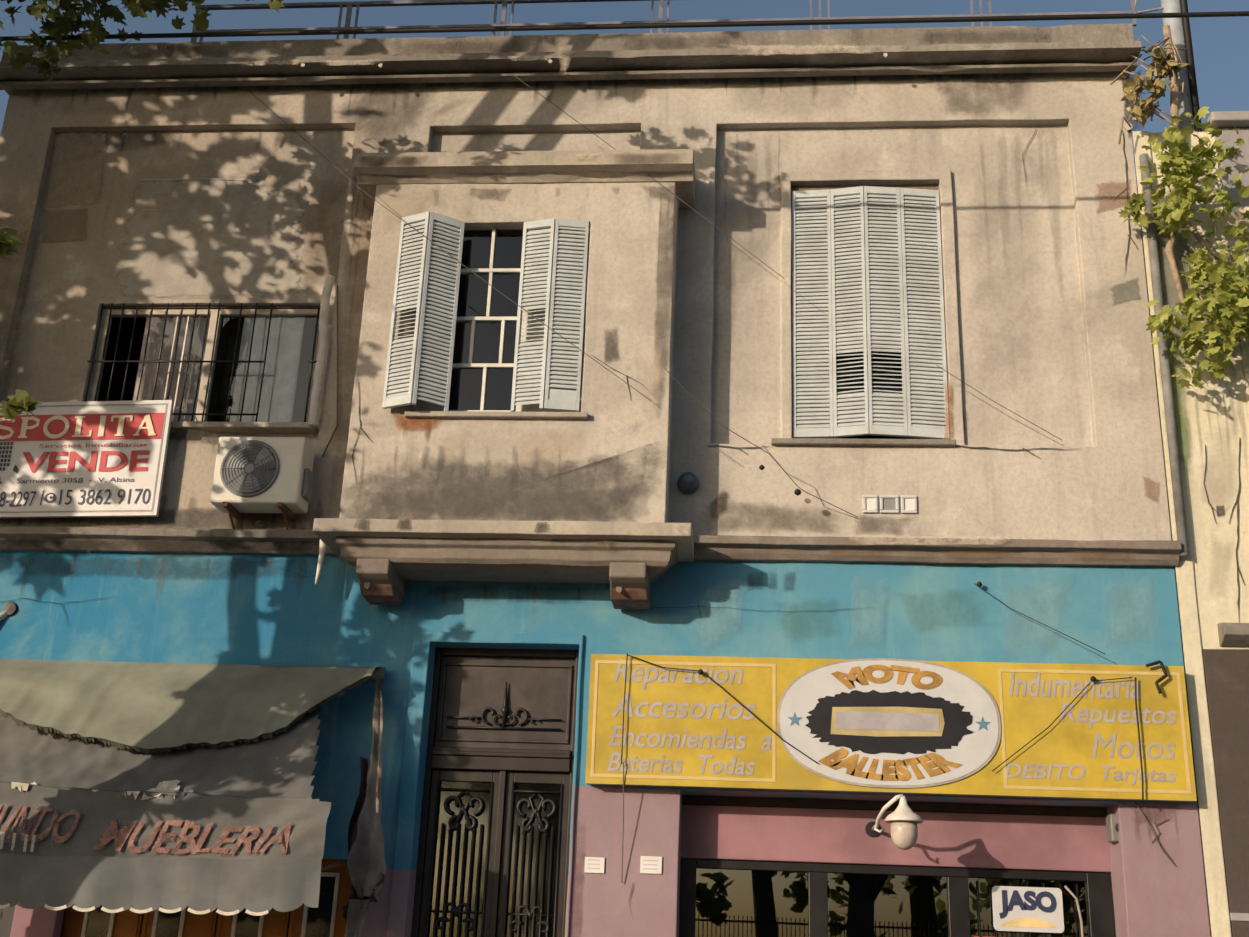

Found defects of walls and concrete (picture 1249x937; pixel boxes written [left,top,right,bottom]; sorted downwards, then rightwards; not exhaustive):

crack [352,382,373,482]
rust [396,415,438,438]
leakage [369,455,643,521]
crack [0,596,114,627]